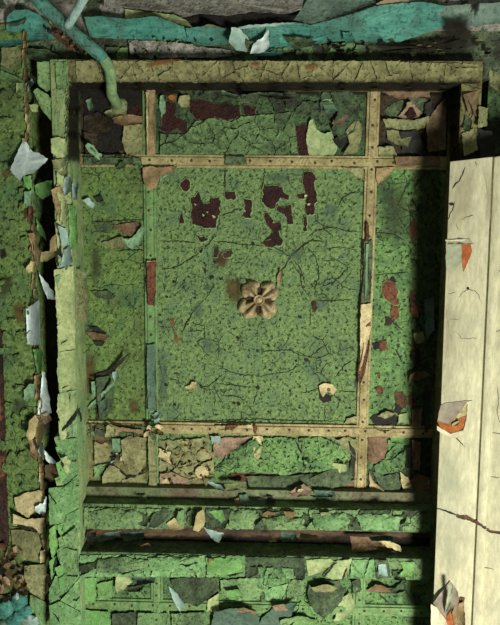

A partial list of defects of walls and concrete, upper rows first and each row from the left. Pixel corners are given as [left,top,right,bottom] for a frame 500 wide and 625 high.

crack [76,60,479,83]
peeling [376,91,446,186]
peeling [445,239,474,272]
corrosion [146,260,158,306]
peeling [0,10,391,625]
crack [164,209,357,405]
corrosion [358,303,388,387]
crack [177,409,333,424]
corrosion [389,392,408,414]
peeling [369,390,472,491]
crack [437,508,500,534]
peeling [431,581,465,625]